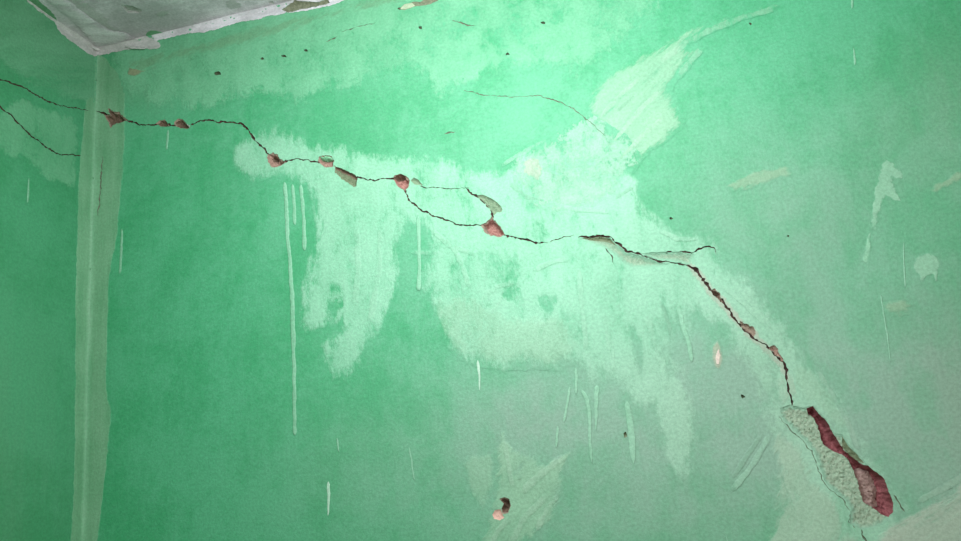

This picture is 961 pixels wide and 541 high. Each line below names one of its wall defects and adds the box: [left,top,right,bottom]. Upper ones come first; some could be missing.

crack [0,106,103,215]
crack [0,79,320,163]
crack [464,90,604,135]
flaking render [477,195,505,237]
crack [357,176,867,541]
flaking render [492,497,511,520]
flaking render [780,405,894,530]